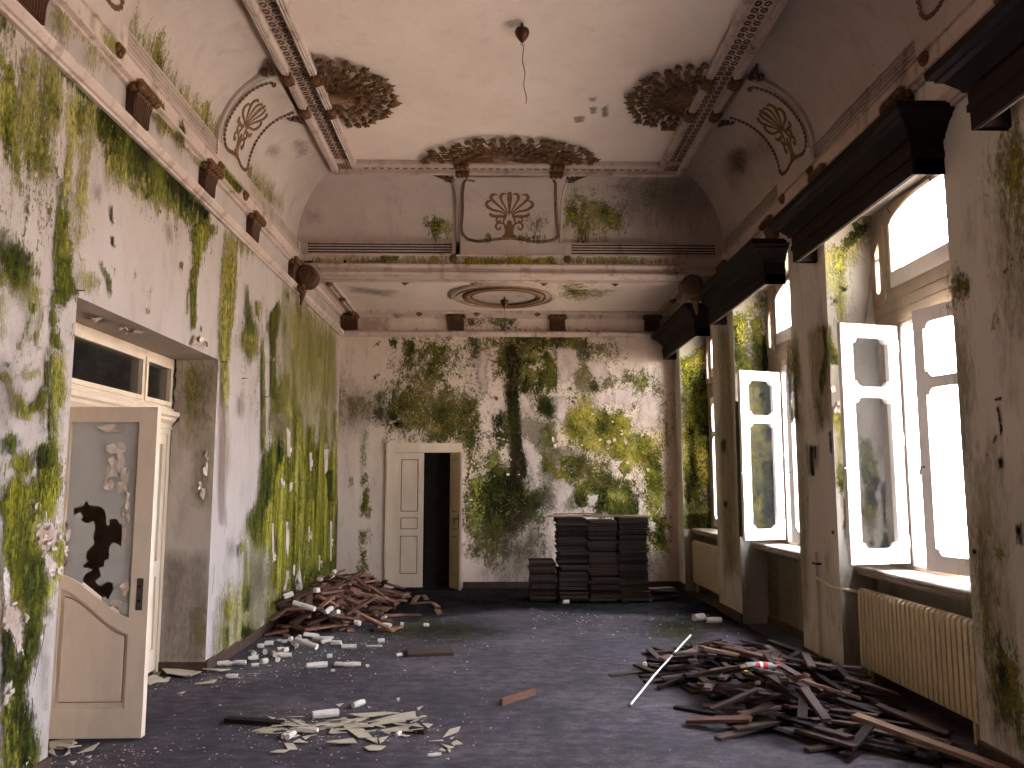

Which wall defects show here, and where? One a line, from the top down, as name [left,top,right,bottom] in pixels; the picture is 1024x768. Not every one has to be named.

damp [339,374,404,429]
damp [489,344,528,480]
peeling [198,451,209,499]
flaking render [310,449,329,474]
flaking render [36,518,71,580]
flaking render [272,521,302,594]
flaking render [319,521,334,571]
damp [648,519,656,573]